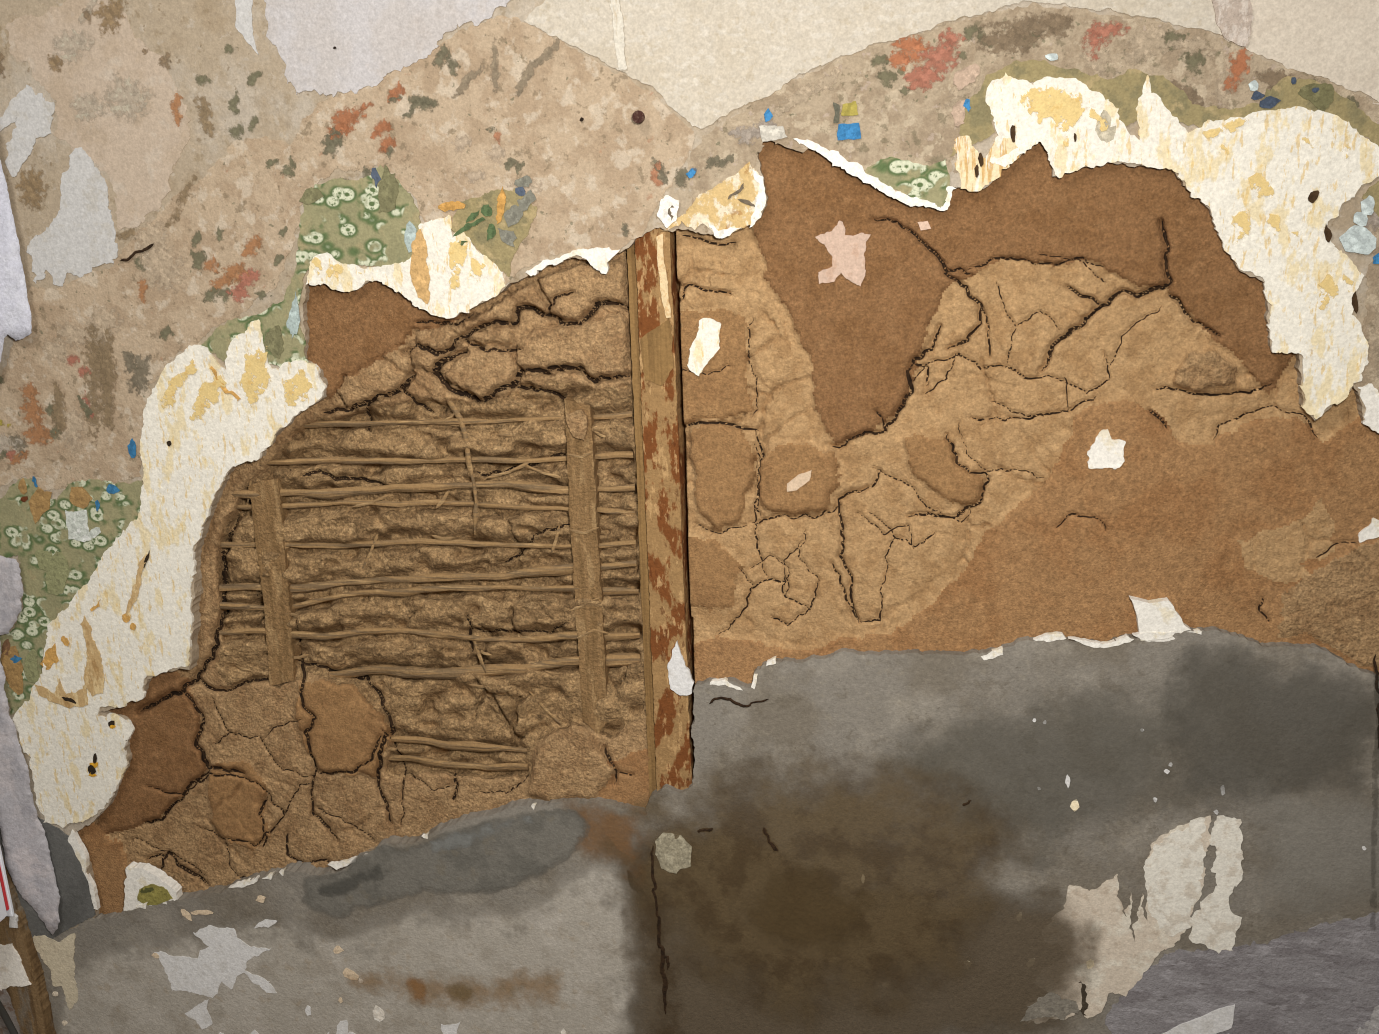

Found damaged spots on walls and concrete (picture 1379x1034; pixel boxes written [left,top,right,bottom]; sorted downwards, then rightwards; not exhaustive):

peeling [0,73,284,304]
peeling [170,0,560,212]
crack [303,469,385,486]
crack [324,292,630,432]
flaking render [68,108,1379,914]
crack [682,218,1220,634]
crack [1149,383,1317,438]
crack [135,517,529,886]
damp [1186,655,1370,790]
peeling [152,909,277,1034]
damp [628,854,1084,1034]
peeling [1021,785,1379,1034]